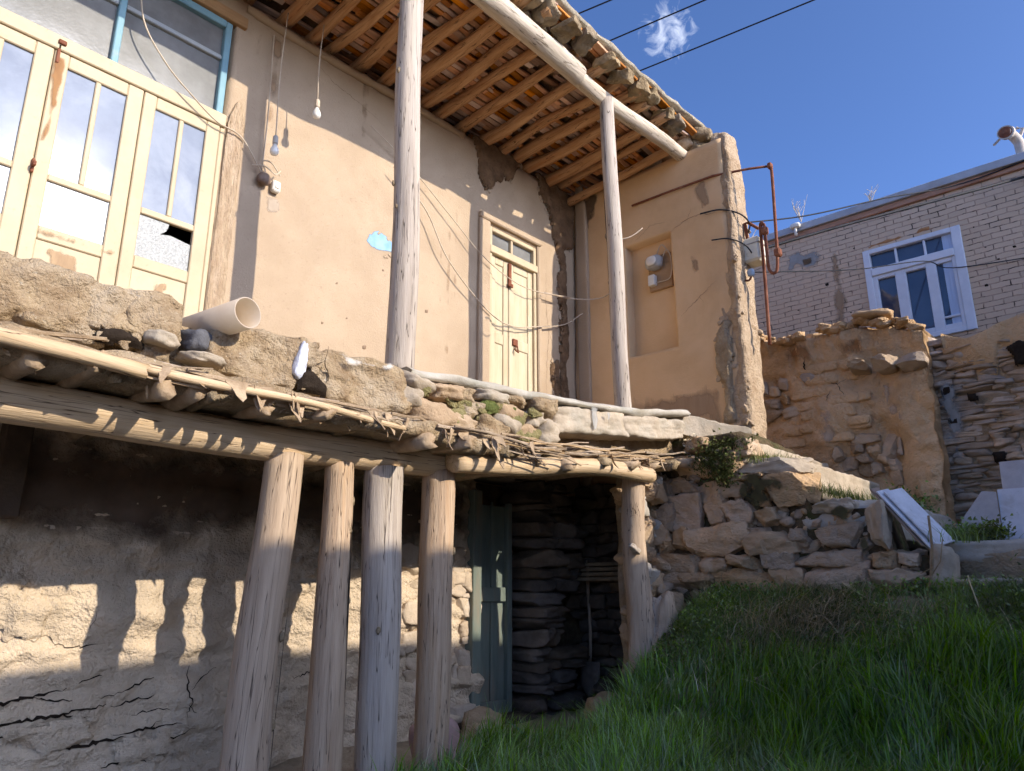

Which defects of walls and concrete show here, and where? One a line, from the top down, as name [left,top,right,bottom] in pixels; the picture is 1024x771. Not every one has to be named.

corrosion [52,58,64,106]
flaking render [471,133,523,194]
flaking render [535,173,575,398]
flaking render [713,315,737,424]
crack [0,667,216,769]